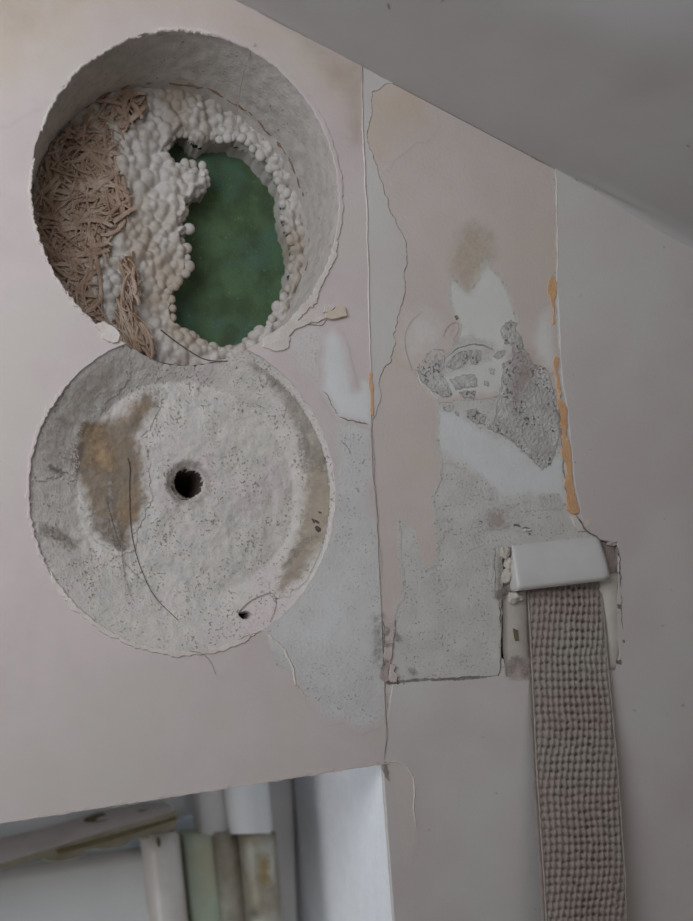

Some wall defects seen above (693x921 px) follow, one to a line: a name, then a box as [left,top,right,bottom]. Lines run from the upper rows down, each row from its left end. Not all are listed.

crack [361,85,371,362]
peeling [547,275,557,325]
leakage [49,385,162,556]
peeling [239,373,398,735]
flaking render [418,321,590,526]